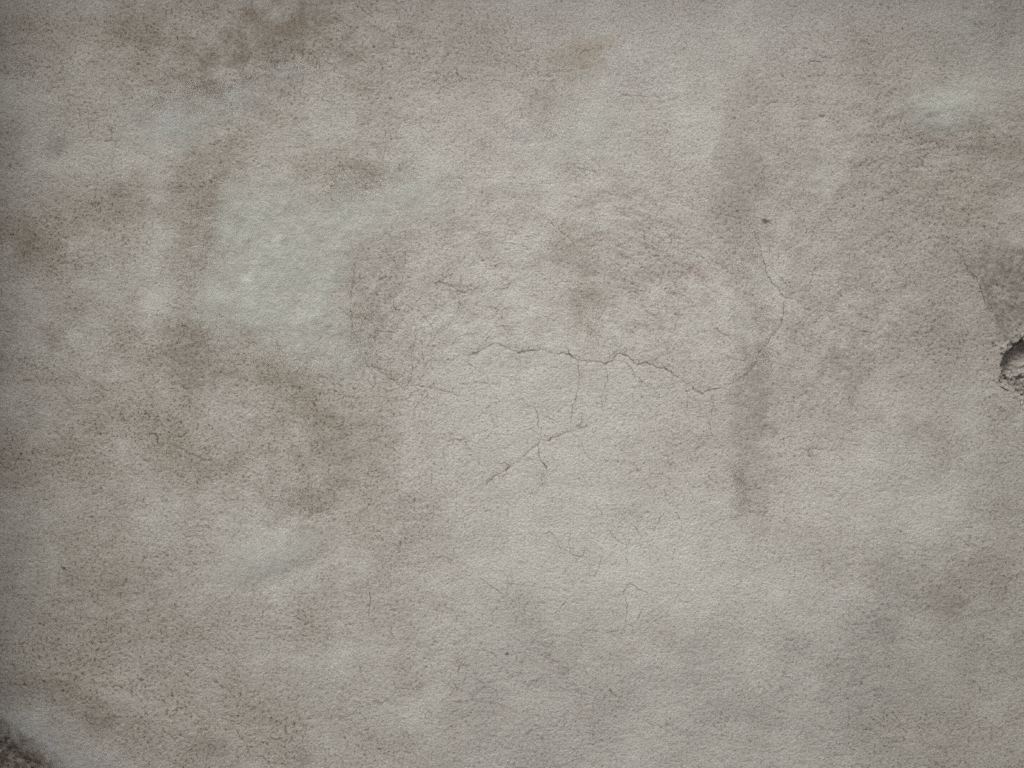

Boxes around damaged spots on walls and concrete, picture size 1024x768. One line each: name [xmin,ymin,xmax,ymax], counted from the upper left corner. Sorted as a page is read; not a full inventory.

crack [603,351,751,418]
spalling [998,332,1024,411]